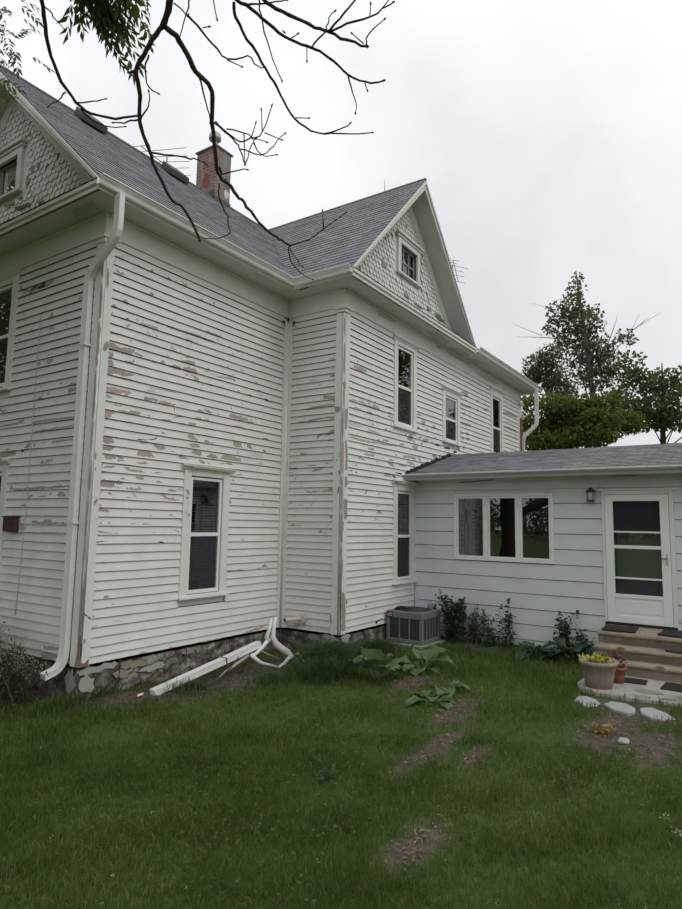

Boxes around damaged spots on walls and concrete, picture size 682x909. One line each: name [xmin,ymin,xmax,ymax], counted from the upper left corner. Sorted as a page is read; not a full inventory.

peeling [85,261,269,543]
peeling [460,391,488,450]